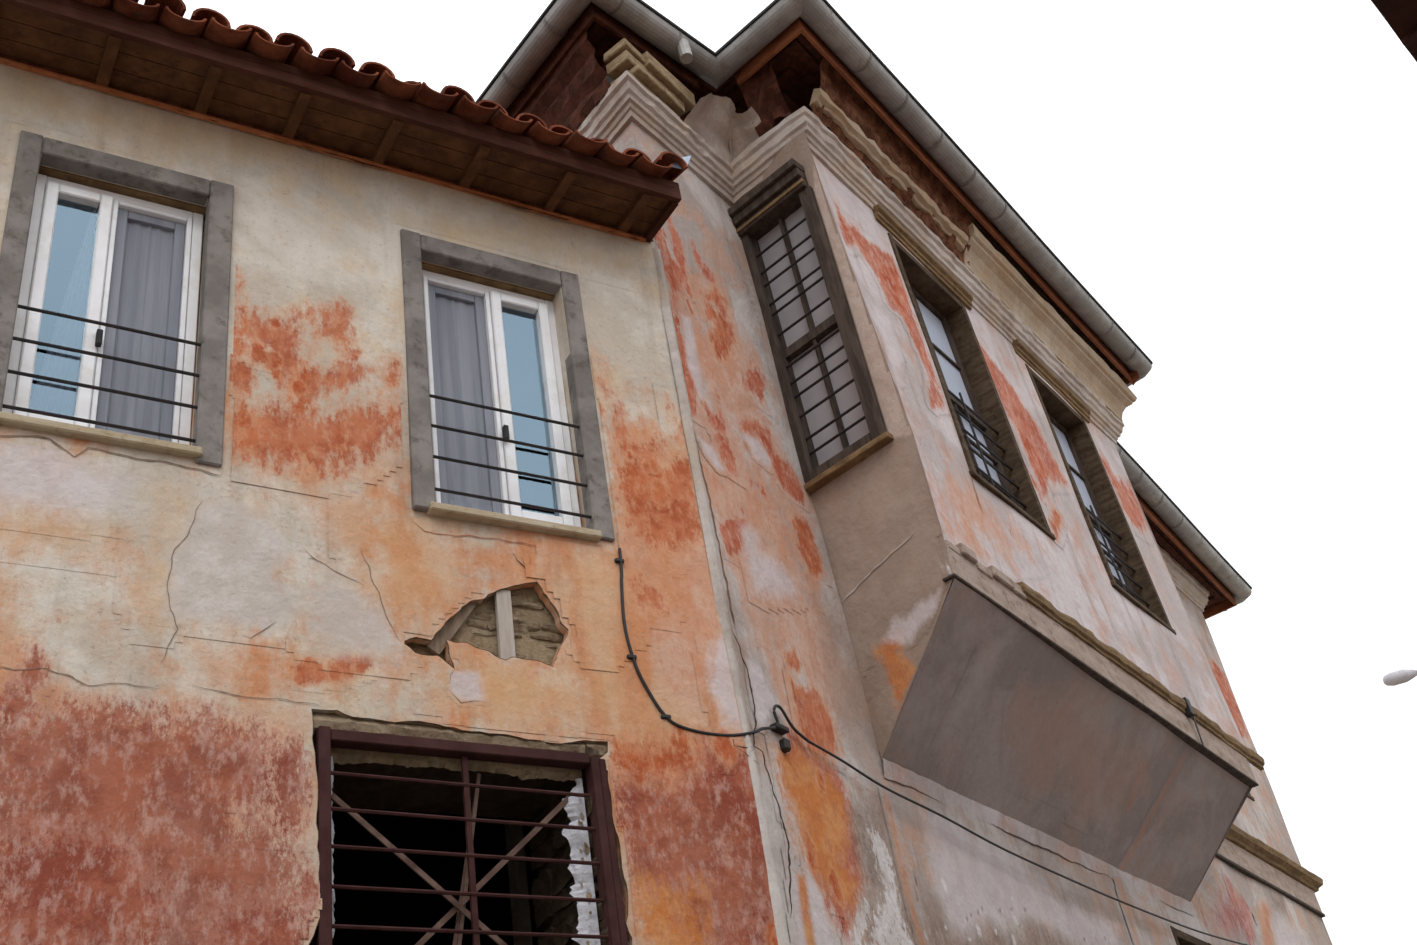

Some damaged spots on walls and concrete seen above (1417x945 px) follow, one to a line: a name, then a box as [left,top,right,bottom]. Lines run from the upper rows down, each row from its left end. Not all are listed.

peeling [826,190,950,417]
crack [0,435,218,689]
crack [194,685,318,705]
crack [304,547,397,637]
peeling [0,212,917,945]
crack [693,427,792,919]
water stain [804,438,1128,945]